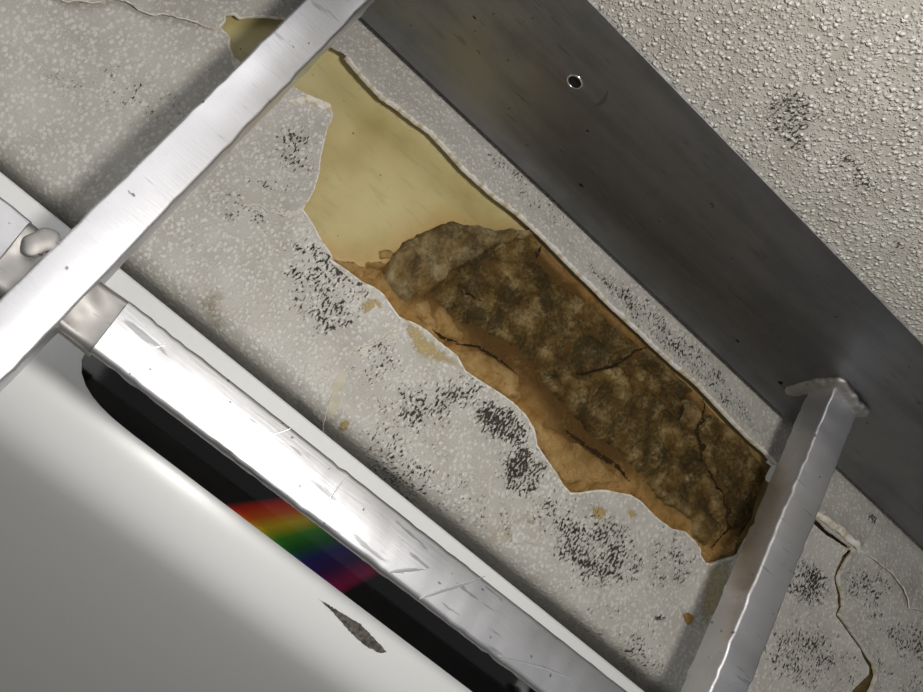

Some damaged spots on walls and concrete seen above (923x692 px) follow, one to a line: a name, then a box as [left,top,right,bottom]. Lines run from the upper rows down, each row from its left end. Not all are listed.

water stain [281,231,381,335]
water stain [352,341,402,388]
water stain [408,326,451,363]
flaking render [334,221,739,563]
water stain [590,264,753,428]
water stain [359,375,696,592]
water stain [787,560,829,609]
crack [814,495,877,692]
water stain [846,566,896,618]
water stain [765,620,862,690]
water stain [879,622,923,691]